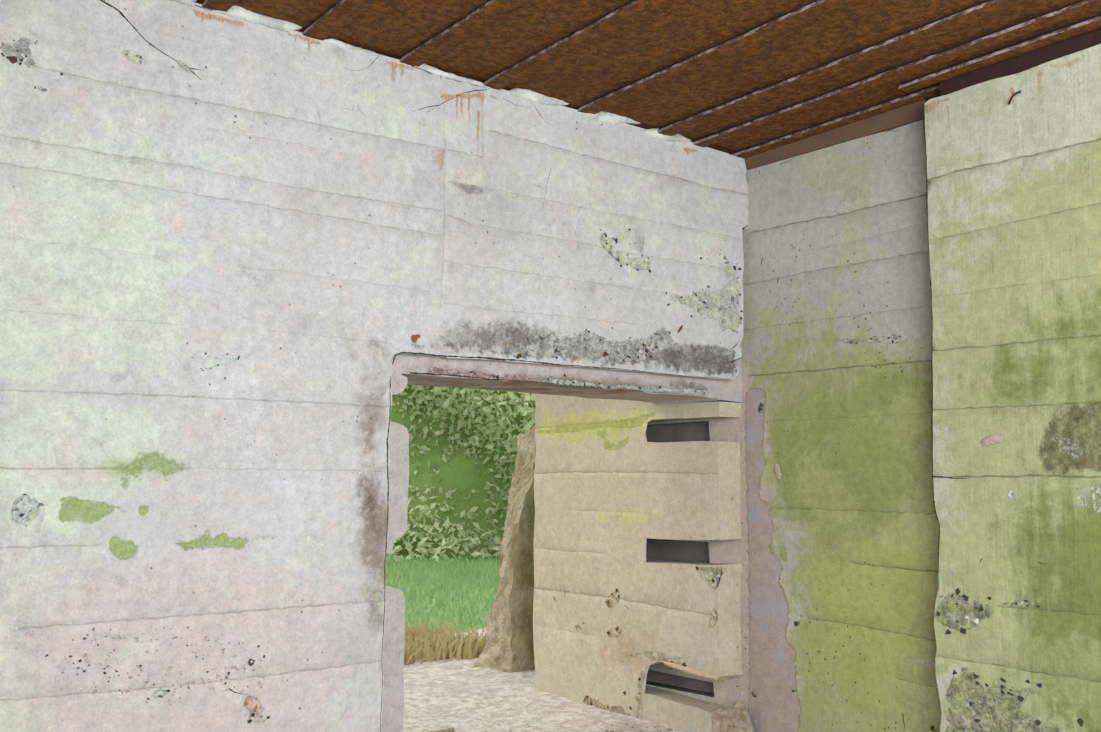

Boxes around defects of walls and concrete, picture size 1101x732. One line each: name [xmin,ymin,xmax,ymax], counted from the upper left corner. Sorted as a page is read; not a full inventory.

crack [100,0,200,79]
corrosion [442,94,496,139]
spalling [665,256,743,333]
water stain [447,323,544,359]
water stain [610,343,737,390]
water stain [1040,407,1101,473]